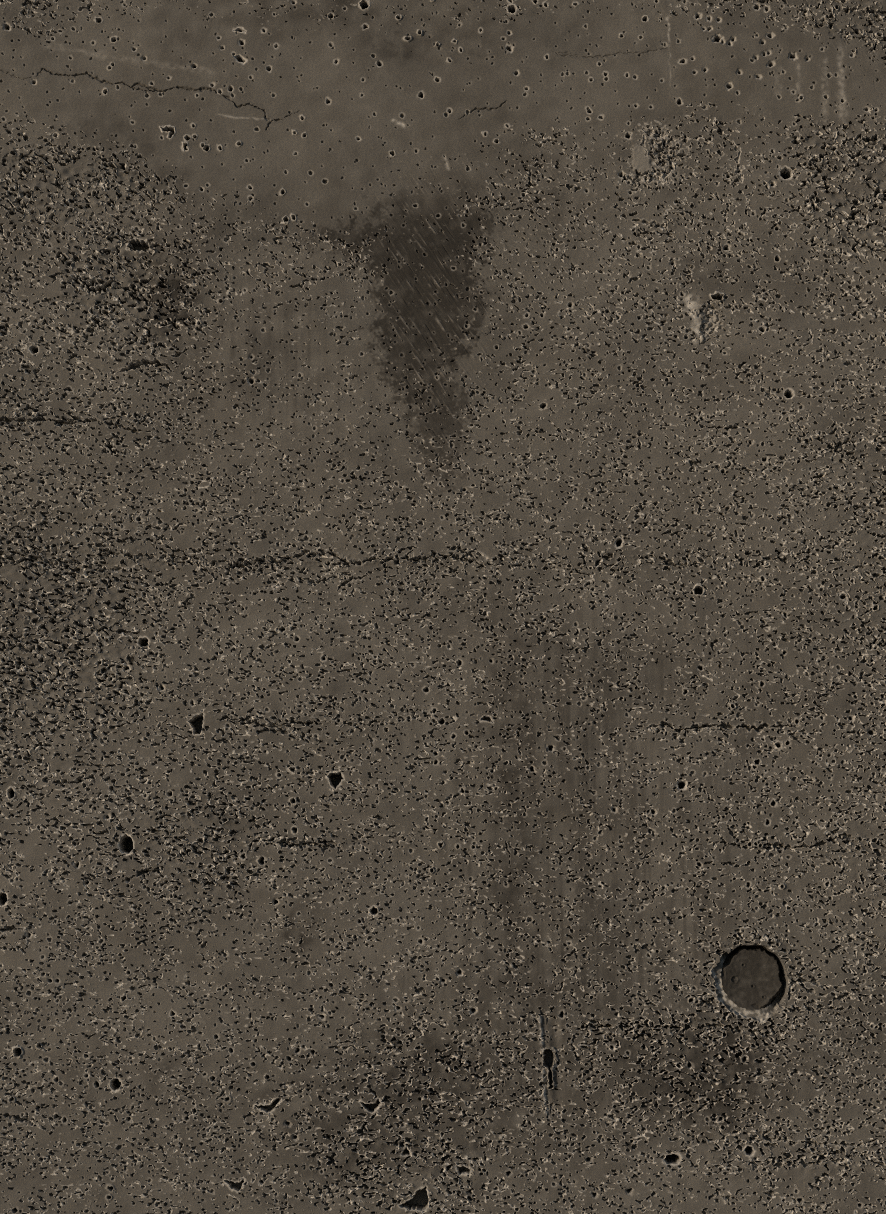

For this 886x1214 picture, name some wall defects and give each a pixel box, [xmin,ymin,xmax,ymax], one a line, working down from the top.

crack [0,68,301,131]
leakage [500,151,613,266]
leakage [297,159,498,497]
crack [2,543,488,590]